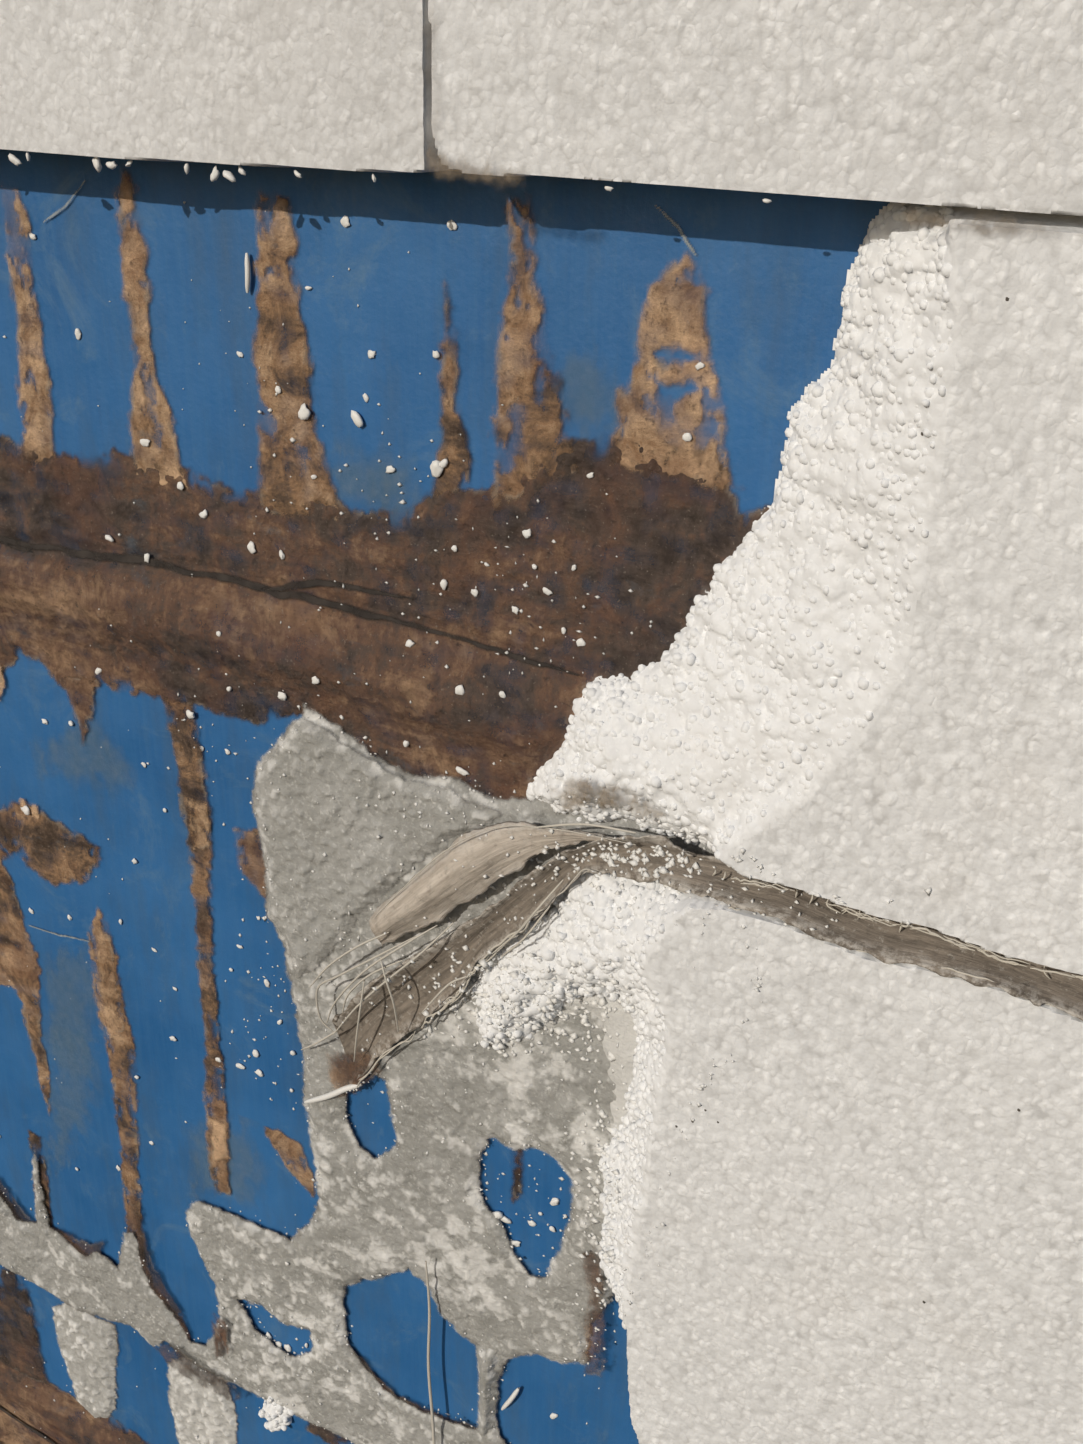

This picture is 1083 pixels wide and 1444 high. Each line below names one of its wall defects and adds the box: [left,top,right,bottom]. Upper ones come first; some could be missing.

spalling [356,0,483,176]
crack [0,536,579,676]
corrosion [0,173,769,1202]
spalling [526,202,1083,879]
peeling [0,799,99,1112]
peeling [254,718,501,978]
corrosion [0,1131,103,1257]
corrosion [88,910,239,1400]
spalling [471,872,967,1444]
corrosion [0,1269,145,1444]